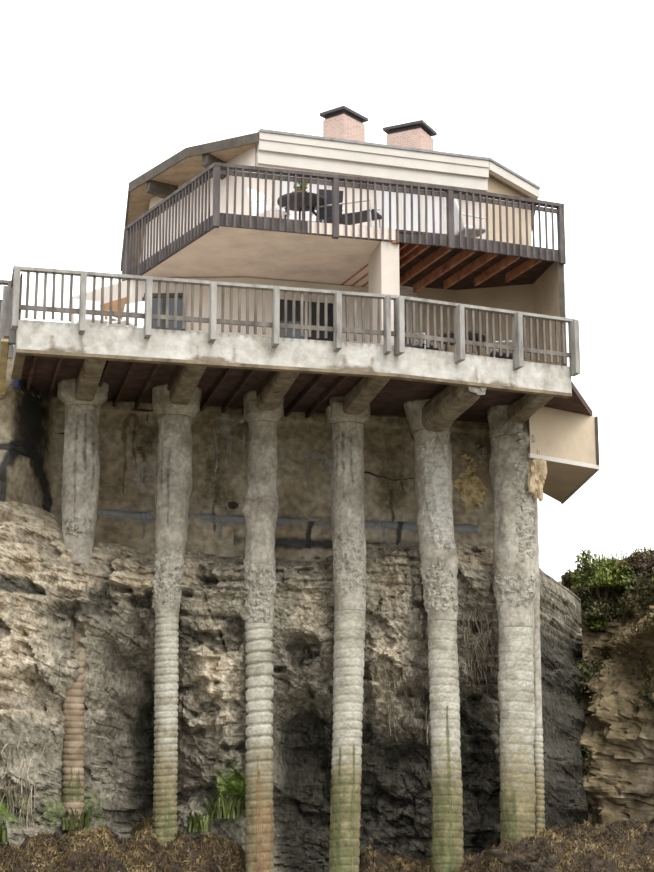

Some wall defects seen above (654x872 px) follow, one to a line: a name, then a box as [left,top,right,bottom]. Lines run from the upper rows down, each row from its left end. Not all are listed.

spalling [151,548,184,608]
spalling [243,559,276,622]
spalling [333,522,366,598]
spalling [419,438,489,612]
spalling [494,424,547,611]
water stain [446,706,454,872]